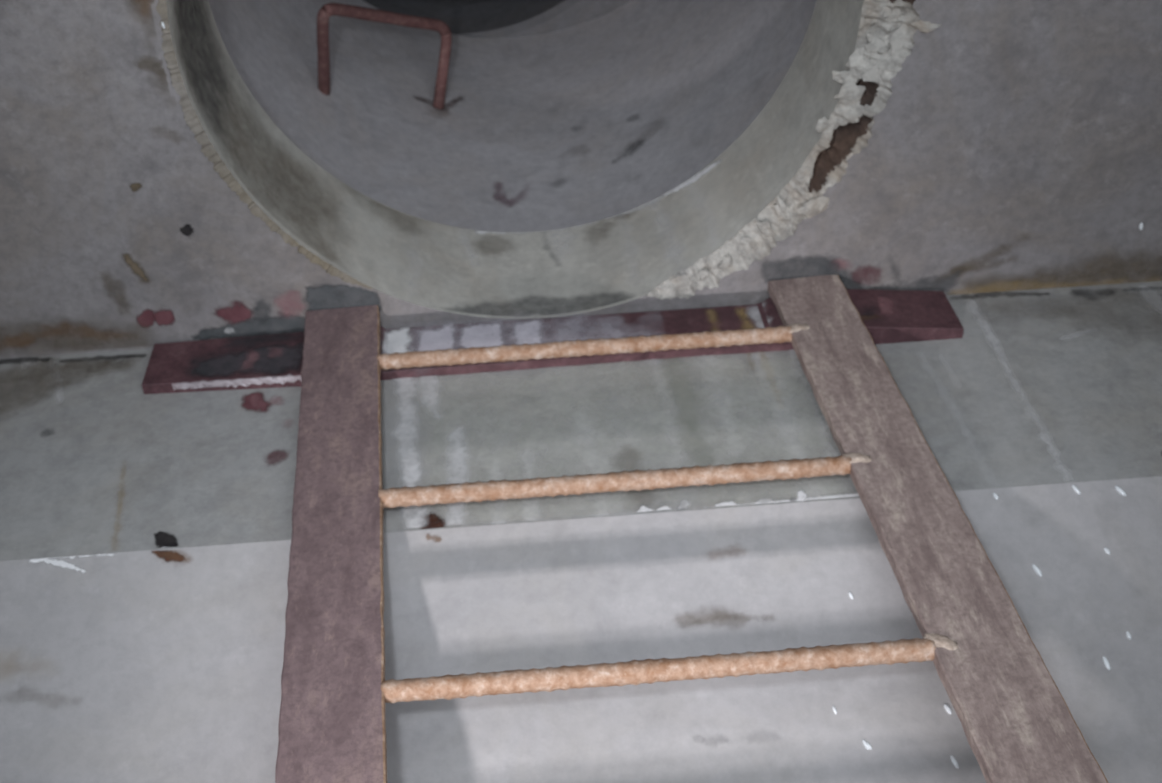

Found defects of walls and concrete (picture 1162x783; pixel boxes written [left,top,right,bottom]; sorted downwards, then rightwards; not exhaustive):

spalling [647,0,942,300]
rust [152,550,184,562]